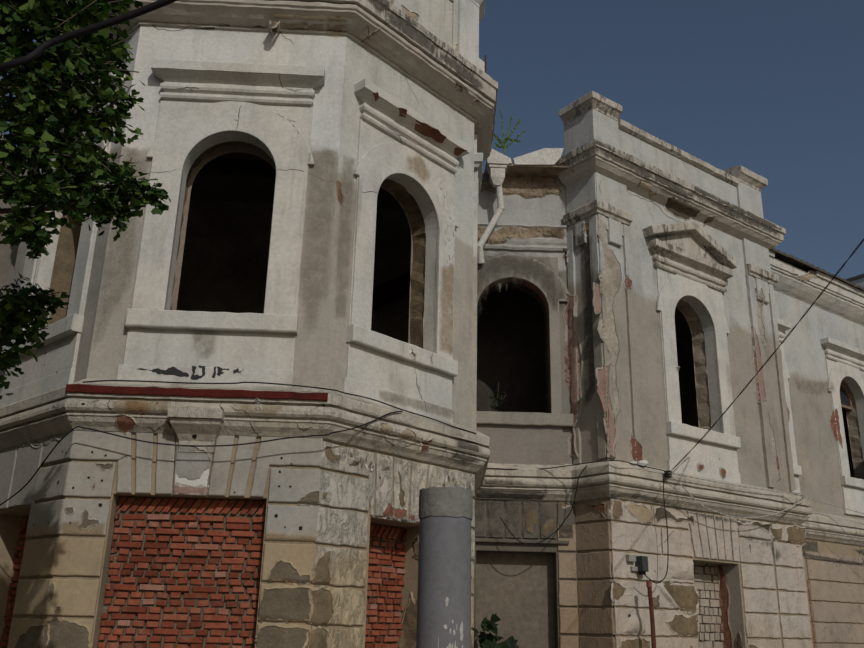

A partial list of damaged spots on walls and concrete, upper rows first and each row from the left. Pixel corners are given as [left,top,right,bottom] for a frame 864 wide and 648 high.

flaking render [414,120,447,143]
spalling [637,180,716,227]
peeling [582,218,632,459]
peeling [563,292,583,458]
flaking render [114,413,138,436]
peeling [174,444,213,495]
flaking render [628,433,643,461]
flaking render [829,408,843,448]
spalling [64,505,101,531]
spalling [255,548,334,648]
flaking render [716,565,765,648]
peeling [438,619,473,648]